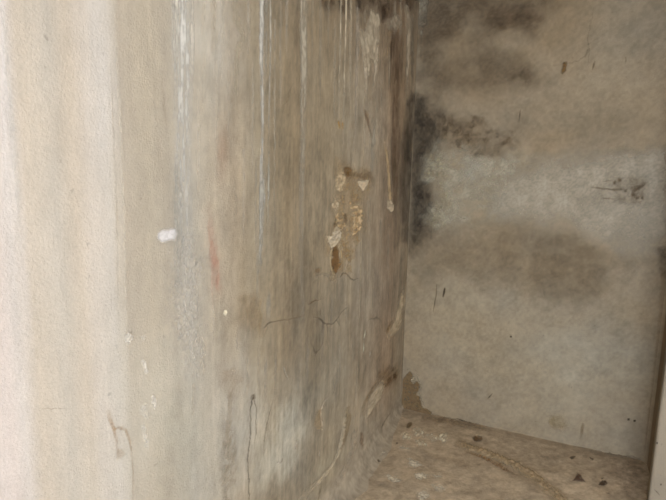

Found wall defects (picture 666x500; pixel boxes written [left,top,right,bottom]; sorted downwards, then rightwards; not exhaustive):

leakage [173,0,194,168]
leakage [259,0,272,124]
leakage [334,0,389,101]
peeling [327,167,369,282]
leakage [405,98,666,244]
flaking render [402,372,431,415]